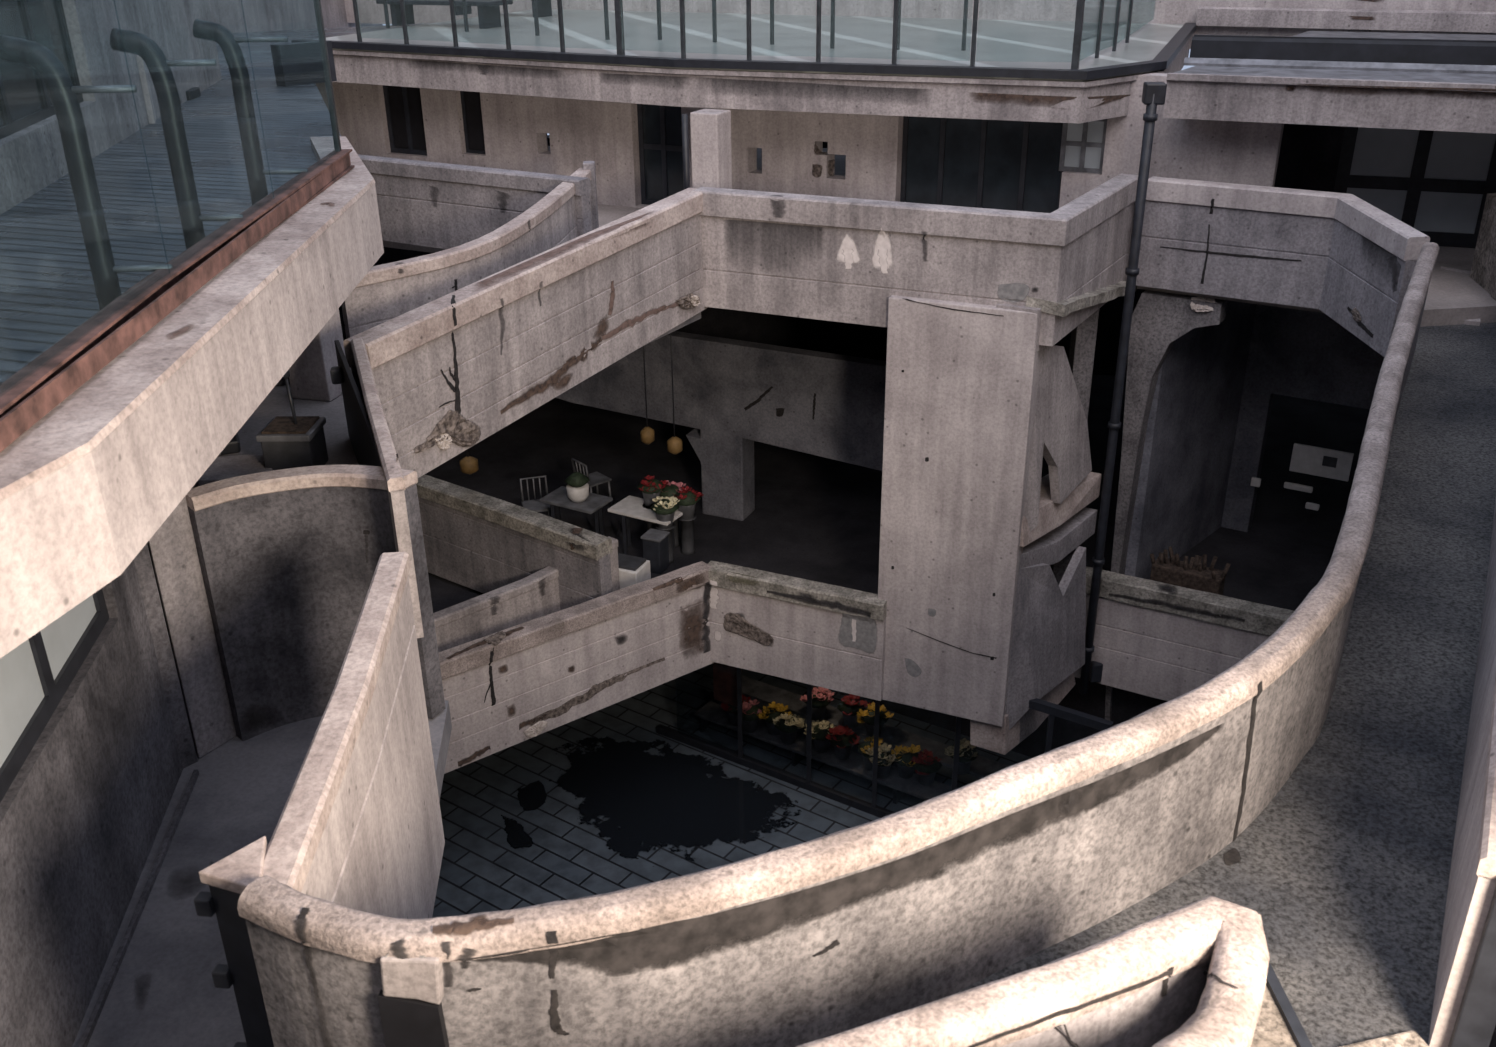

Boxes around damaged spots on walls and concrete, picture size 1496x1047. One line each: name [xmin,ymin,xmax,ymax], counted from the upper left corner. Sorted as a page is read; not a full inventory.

crack [1160,199,1302,284]
spalling [676,293,700,310]
crack [439,279,461,414]
spalling [723,613,774,646]
crack [484,643,496,706]
spalling [519,657,665,738]
spalling [458,746,491,767]
damp [294,907,332,1047]